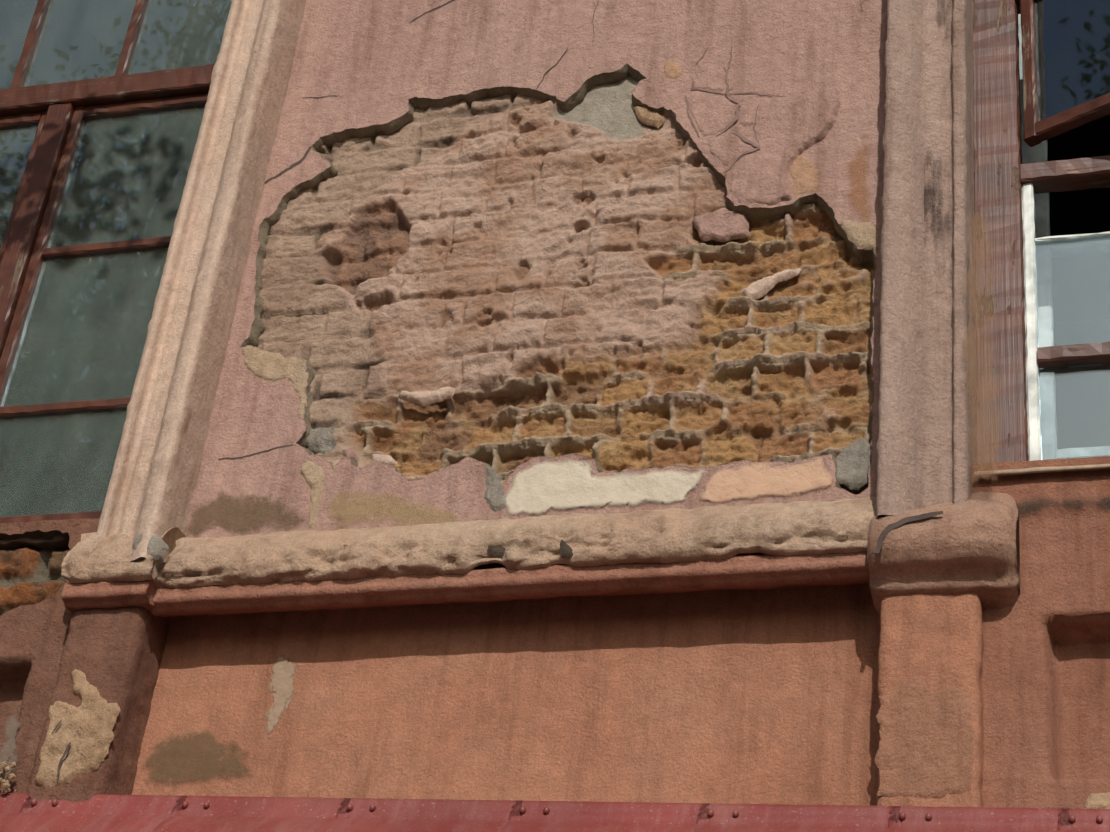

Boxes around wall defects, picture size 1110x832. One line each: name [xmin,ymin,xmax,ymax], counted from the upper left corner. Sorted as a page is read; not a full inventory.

crack [685,40,786,169]
flaking render [240,64,880,512]
flaking render [0,530,71,616]
flaking render [0,714,20,780]
flaking render [35,669,120,789]
peeling [266,654,298,738]